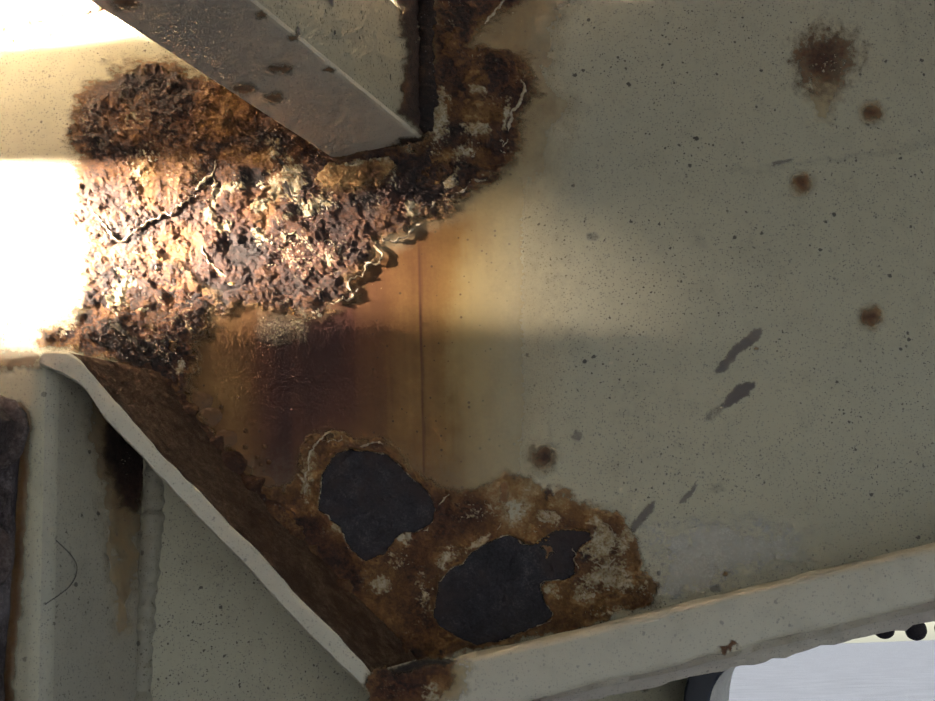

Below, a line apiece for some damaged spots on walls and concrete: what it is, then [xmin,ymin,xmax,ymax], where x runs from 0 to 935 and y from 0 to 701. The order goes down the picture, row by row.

rust [788,23,860,114]
rust [863,104,882,120]
rust [793,174,809,192]
rust [0,0,660,701]
rust [861,306,881,327]
peeling [318,449,436,561]
peeling [433,529,591,645]